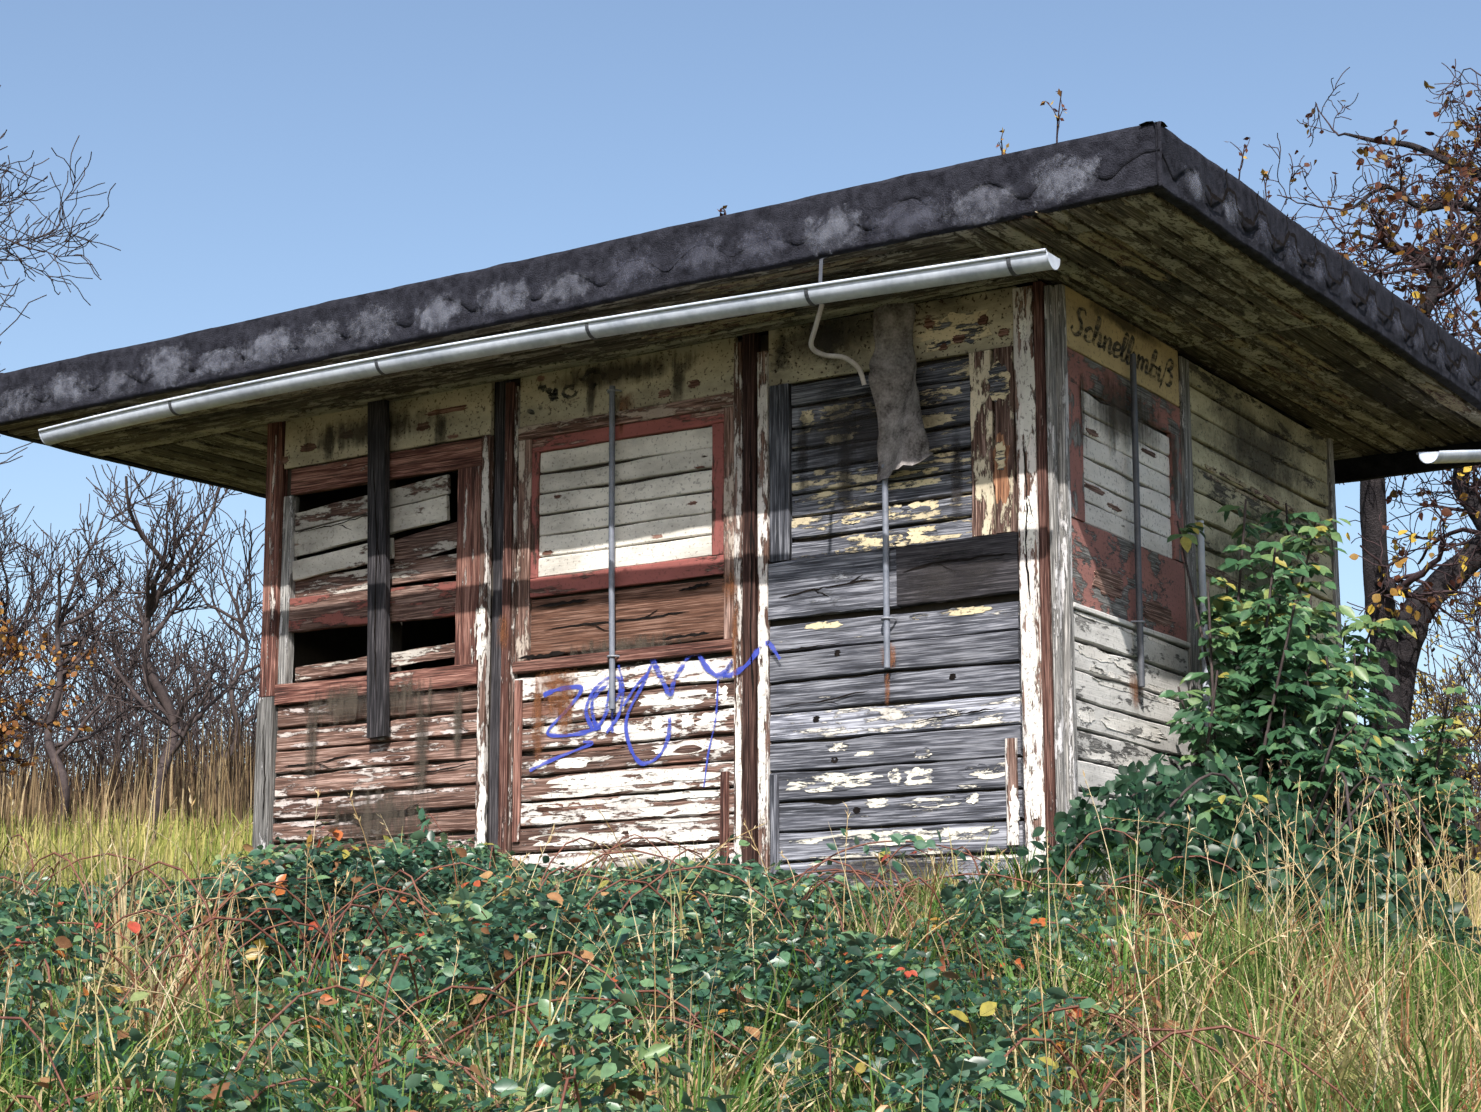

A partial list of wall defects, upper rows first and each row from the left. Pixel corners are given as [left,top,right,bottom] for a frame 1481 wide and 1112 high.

peeling [800,404,855,424]
peeling [914,309,1036,554]
peeling [799,470,835,502]
peeling [842,452,955,551]
peeling [1084,482,1123,512]
peeling [476,605,486,660]
peeling [280,706,328,715]
peeling [336,755,410,767]
peeling [410,729,468,738]
peeling [529,632,767,870]
peeling [785,599,1044,873]
peeling [280,785,487,851]